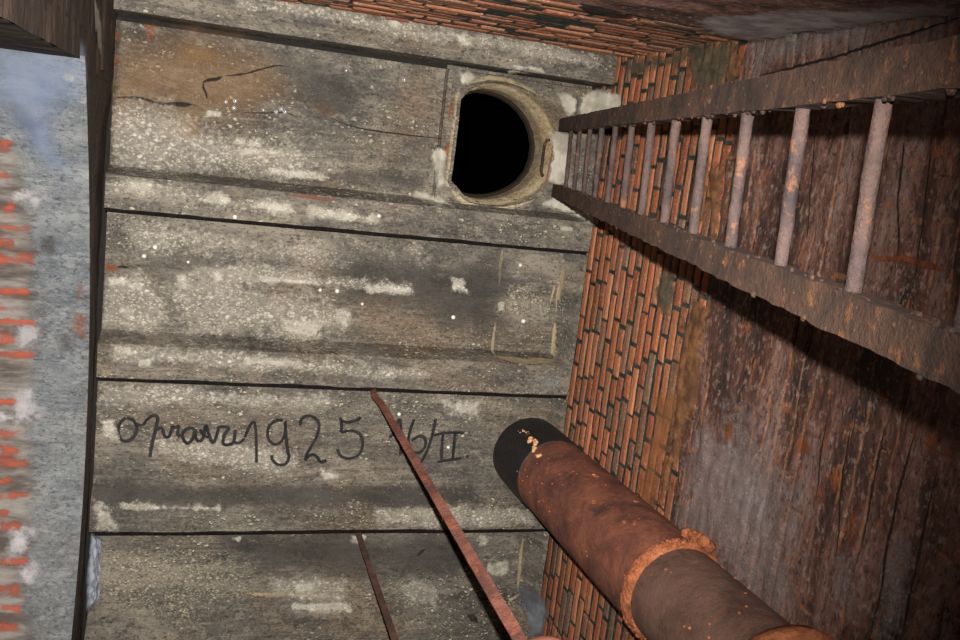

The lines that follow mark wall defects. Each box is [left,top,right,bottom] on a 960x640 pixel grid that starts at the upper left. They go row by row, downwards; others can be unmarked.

crack [117,65,289,107]
water stain [640,293,799,612]
crack [816,405,856,548]
crack [863,424,917,640]
crack [900,470,938,640]